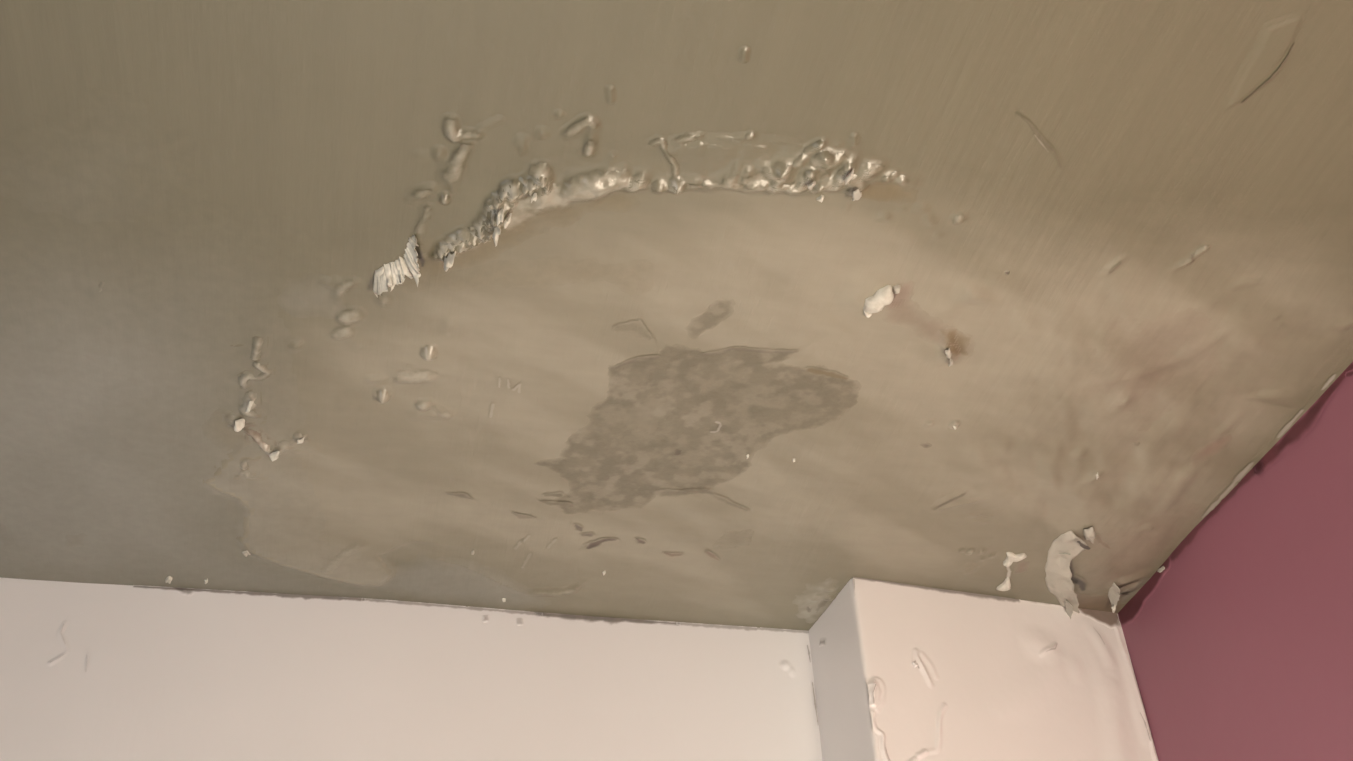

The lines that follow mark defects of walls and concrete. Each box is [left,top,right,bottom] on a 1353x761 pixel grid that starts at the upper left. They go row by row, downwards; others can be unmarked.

peeling [373,160,686,298]
spalling [863,285,901,318]
peeling [225,337,310,462]
water stain [533,299,862,515]
peeling [996,527,1158,761]